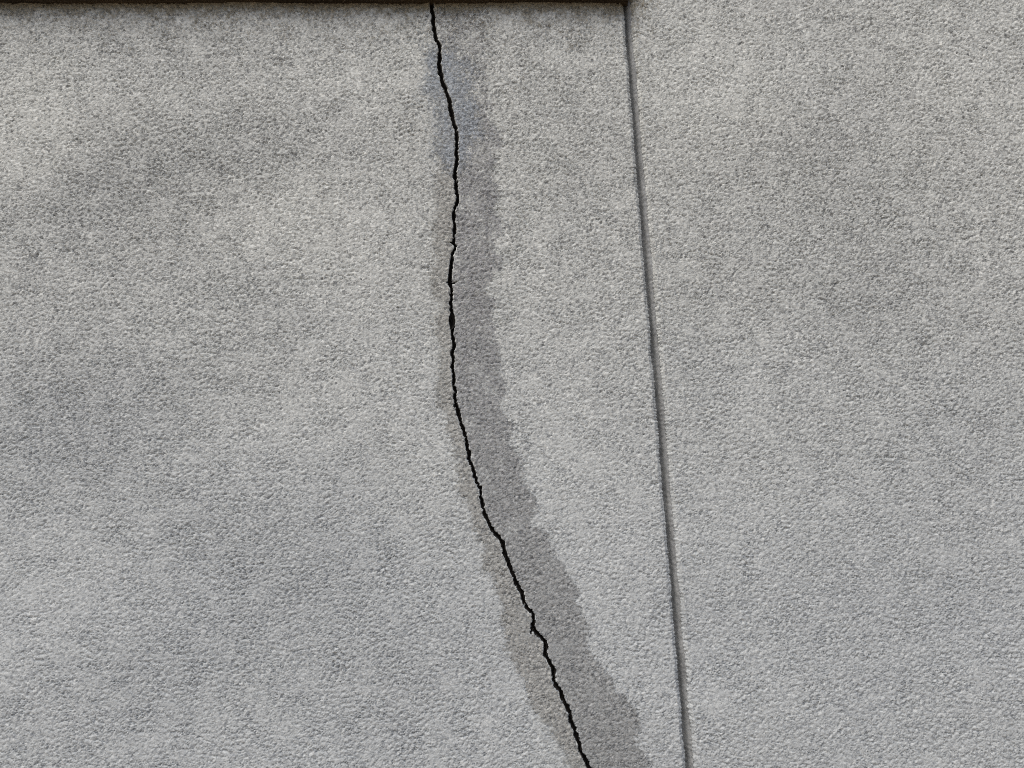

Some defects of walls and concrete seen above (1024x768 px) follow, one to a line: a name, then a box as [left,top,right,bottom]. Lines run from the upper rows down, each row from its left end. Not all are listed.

water stain [0,0,652,768]
crack [430,4,591,768]